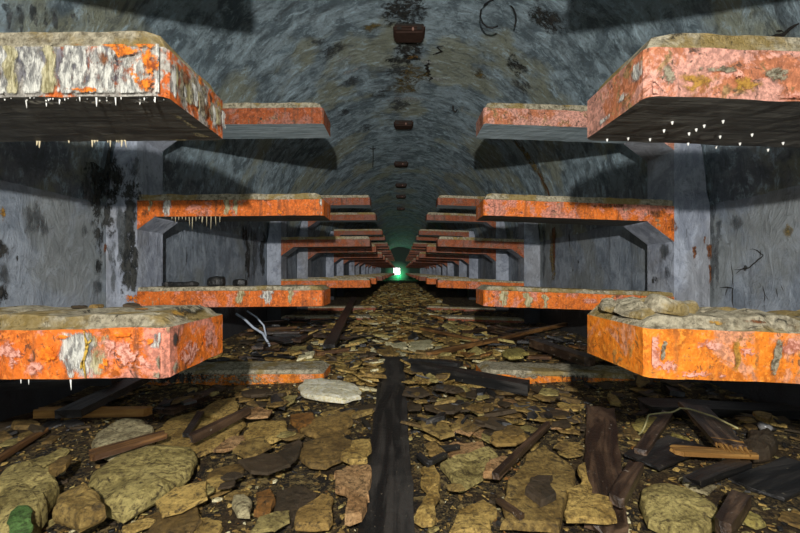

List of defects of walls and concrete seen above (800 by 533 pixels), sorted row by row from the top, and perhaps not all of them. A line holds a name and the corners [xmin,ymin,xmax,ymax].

corrosion [99,44,159,91]
water stain [26,204,48,234]
water stain [82,144,152,294]
crack [720,249,763,308]